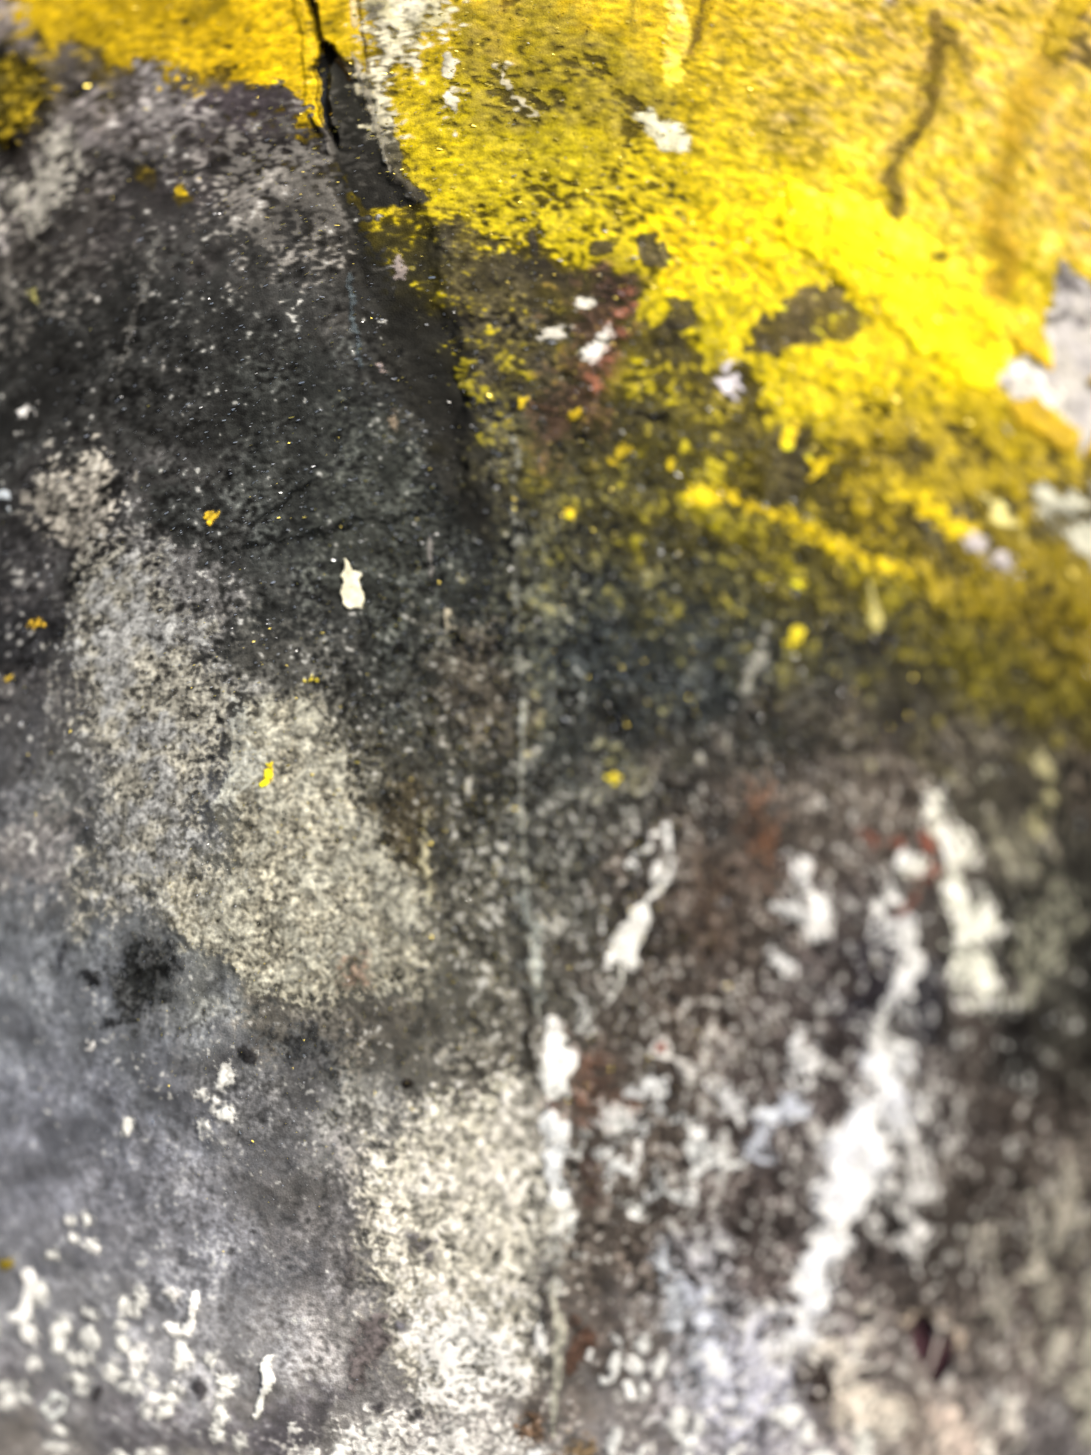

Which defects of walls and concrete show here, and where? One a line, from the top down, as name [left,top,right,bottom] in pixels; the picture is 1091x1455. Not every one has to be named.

crack [305,0,352,147]
spalling [0,96,98,255]
damp [581,323,615,364]
damp [56,529,434,1087]
damp [604,859,676,1000]
peeling [112,1088,154,1136]
damp [649,752,1091,1455]
peeling [0,1214,246,1451]
damp [191,1376,208,1401]